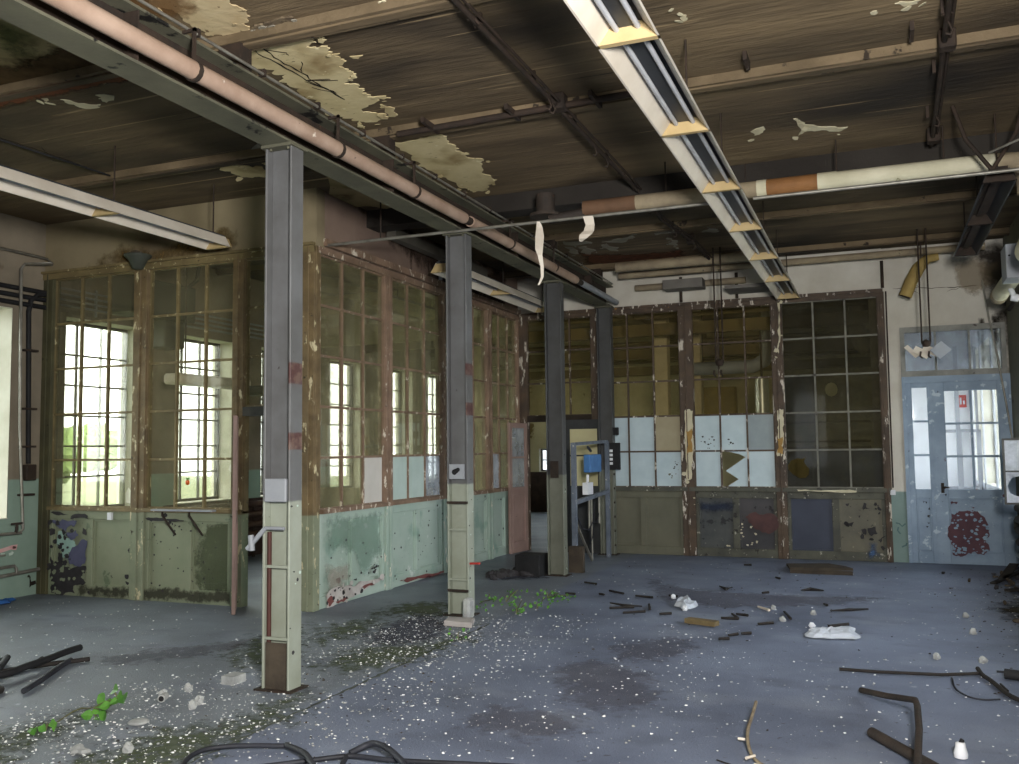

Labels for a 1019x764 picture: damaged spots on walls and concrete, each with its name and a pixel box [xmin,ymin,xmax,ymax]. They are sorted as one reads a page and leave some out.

peeling [178,0,297,36]
peeling [895,0,926,11]
water stain [0,47,95,85]
peeling [36,94,114,109]
crack [256,49,345,100]
peeling [252,36,398,129]
peeling [792,118,847,140]
peeling [220,162,266,181]
peeling [395,134,497,194]
peeling [682,409,694,484]
peeling [47,511,90,595]
peeling [326,547,444,608]